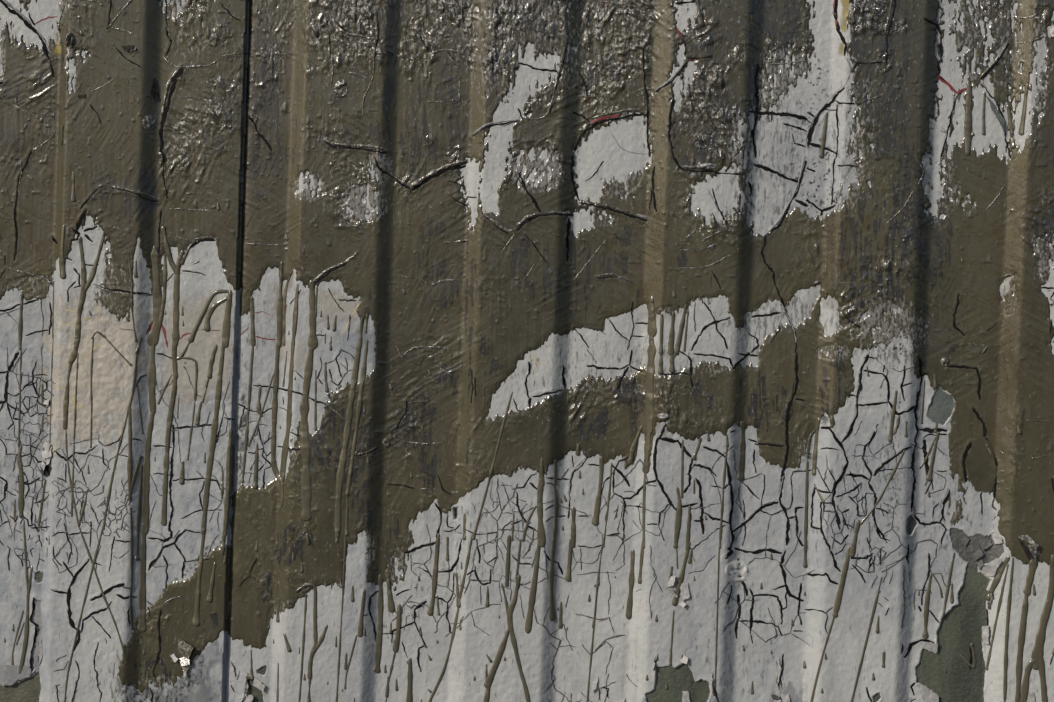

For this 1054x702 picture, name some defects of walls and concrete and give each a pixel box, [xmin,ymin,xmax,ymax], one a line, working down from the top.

crack [885,0,1053,225]
crack [0,0,363,702]
crack [322,0,1012,702]
peeling [41,441,52,477]
peeling [966,437,997,492]
peeling [907,516,917,535]
peeling [666,576,690,608]
peeling [916,528,1004,702]
peeling [0,597,44,702]
peeling [171,638,193,677]
peeling [231,662,267,702]
peeling [642,655,719,702]